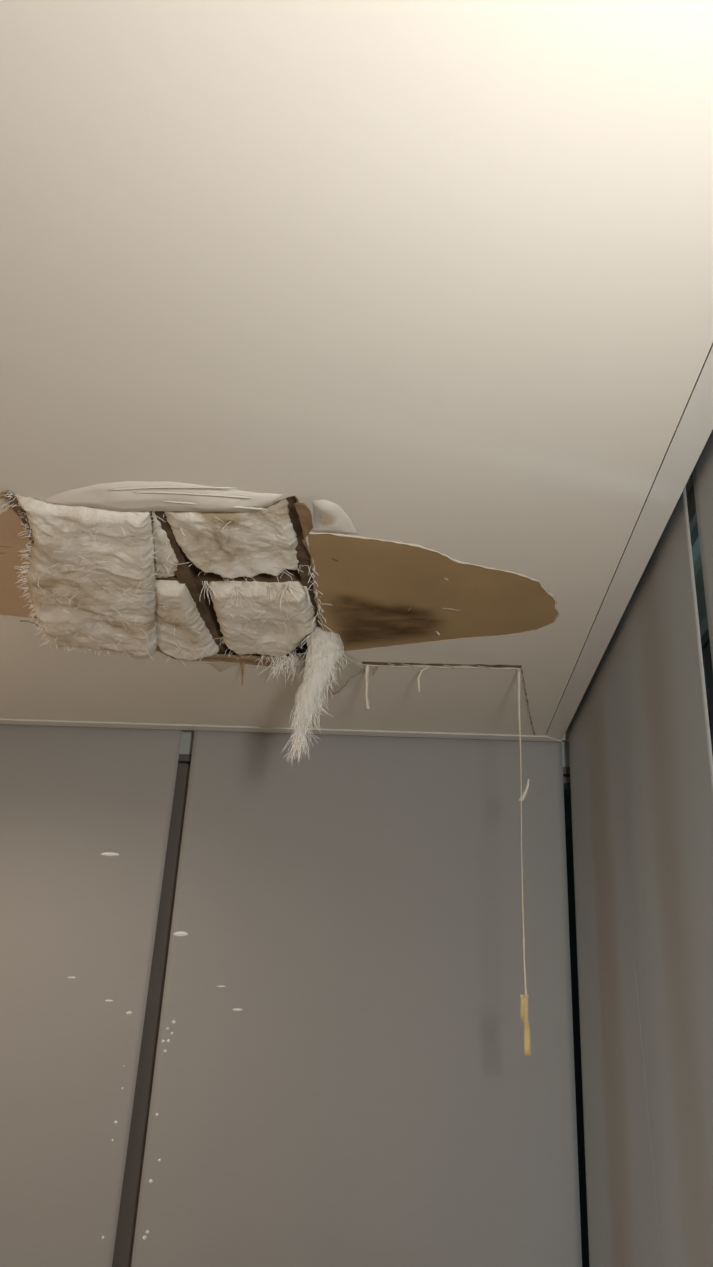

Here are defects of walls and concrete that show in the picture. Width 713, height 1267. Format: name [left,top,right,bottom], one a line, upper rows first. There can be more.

peeling [0,495,44,630]
spalling [156,649,305,667]
water stain [343,600,434,642]
peeling [299,518,560,695]
crack [362,661,535,736]